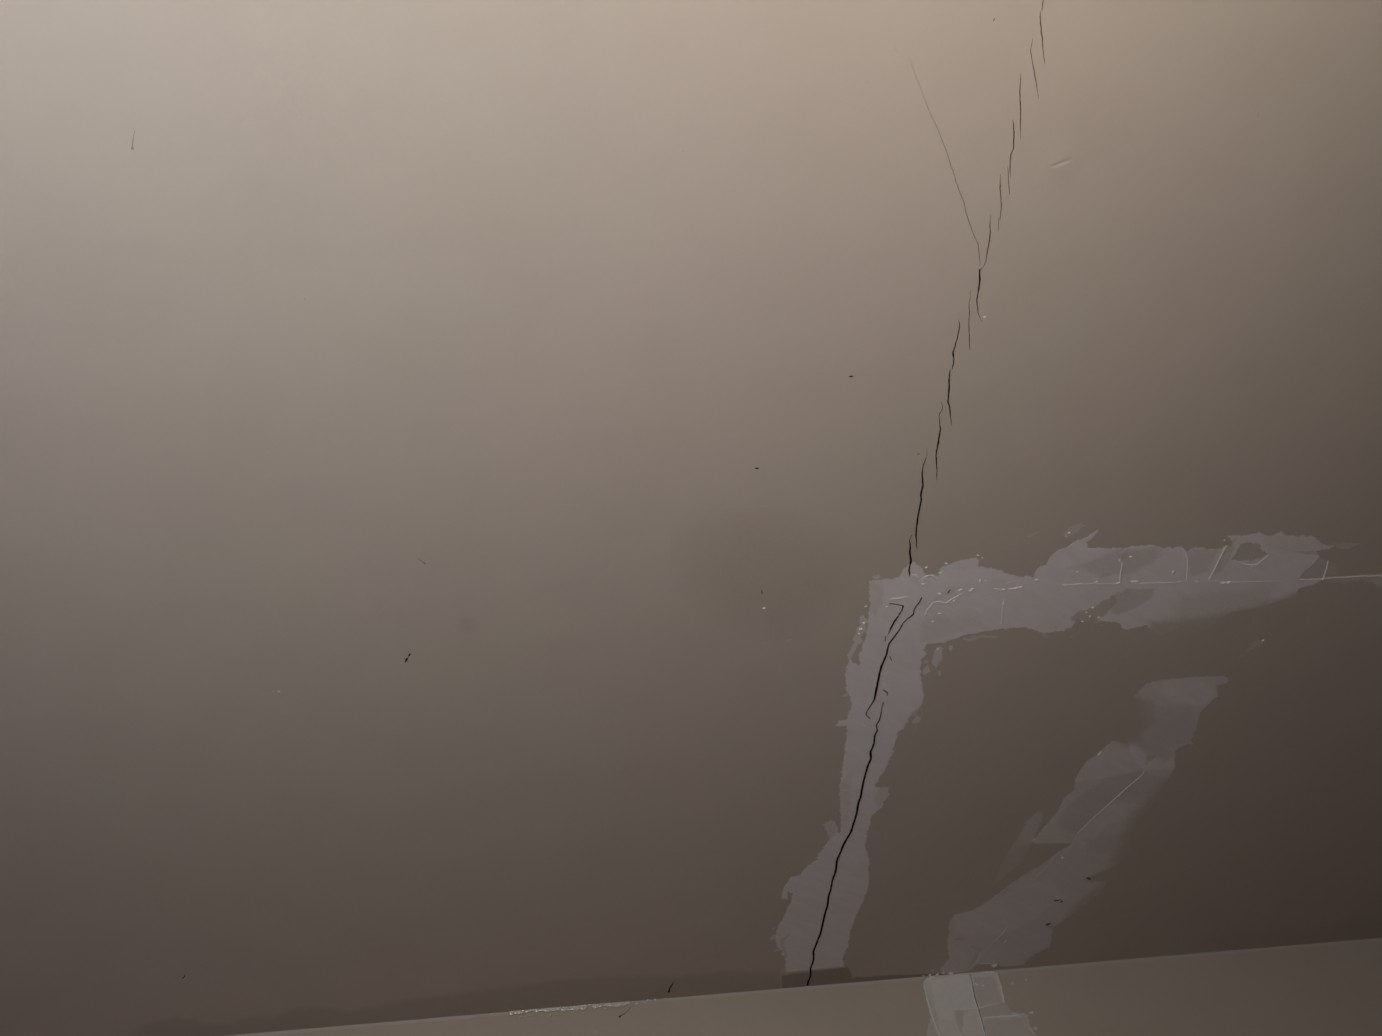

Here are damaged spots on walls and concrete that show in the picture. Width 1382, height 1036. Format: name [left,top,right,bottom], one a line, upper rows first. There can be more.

crack [807,2,1045,986]